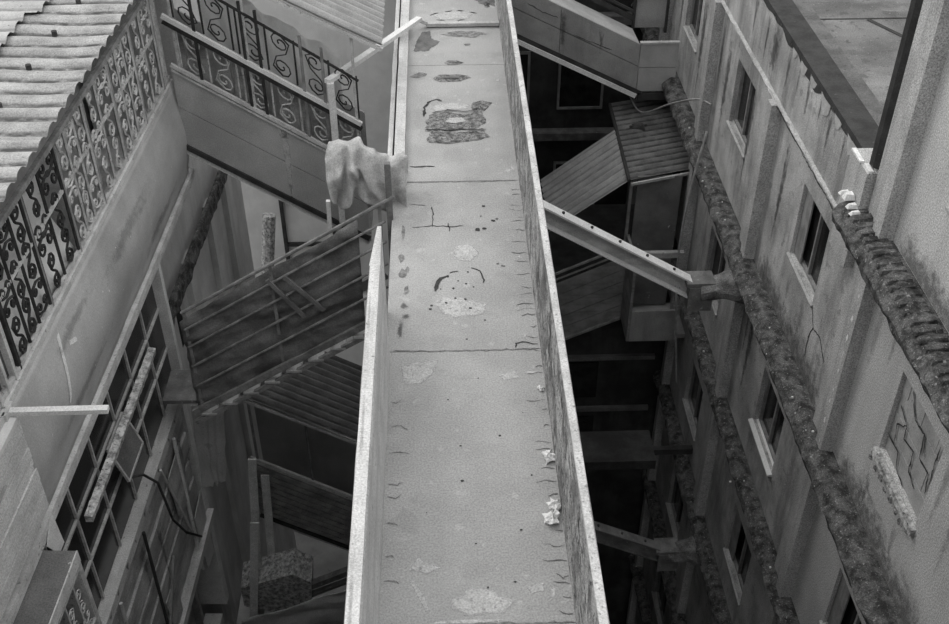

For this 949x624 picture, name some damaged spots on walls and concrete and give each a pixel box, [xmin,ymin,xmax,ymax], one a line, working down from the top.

spalling [411,60,471,82]
spalling [423,99,492,144]
crack [393,166,558,496]
crack [804,309,824,363]
crack [433,530,574,624]